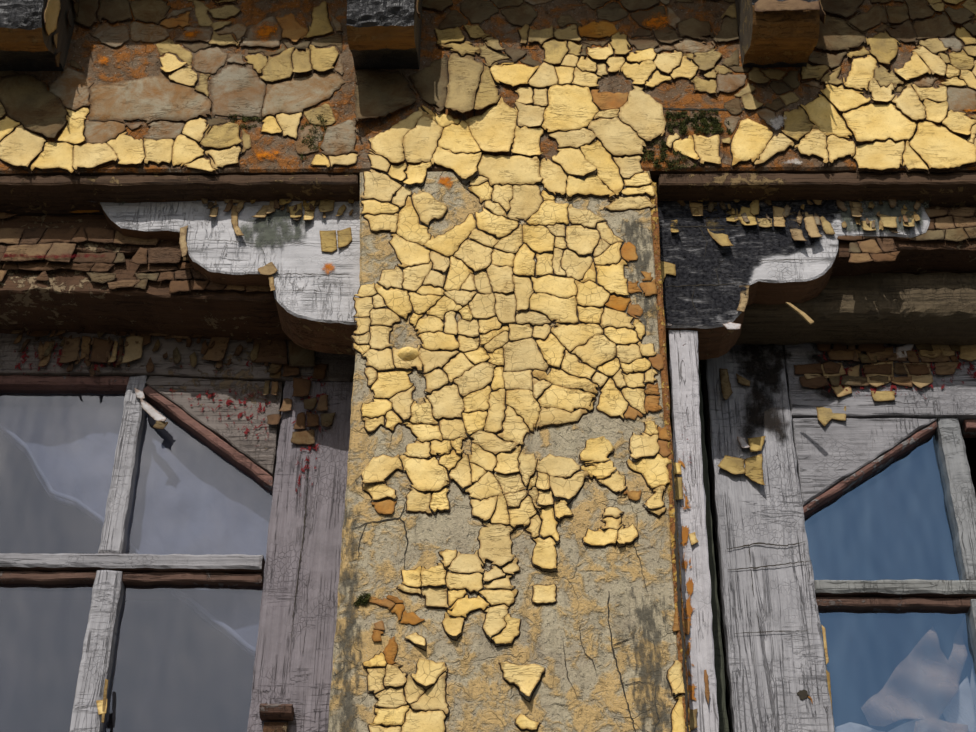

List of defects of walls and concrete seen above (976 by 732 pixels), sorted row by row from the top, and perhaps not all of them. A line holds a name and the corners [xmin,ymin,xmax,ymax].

peeling [0,0,417,177]
peeling [0,210,278,294]
peeling [193,198,354,236]
peeling [319,227,352,253]
peeling [351,0,976,647]
peeling [11,328,336,445]
damp [730,344,791,442]
peeling [362,621,450,732]
peeling [498,660,546,703]
peeling [514,714,541,732]
crack [539,591,658,732]
peeling [666,660,698,732]